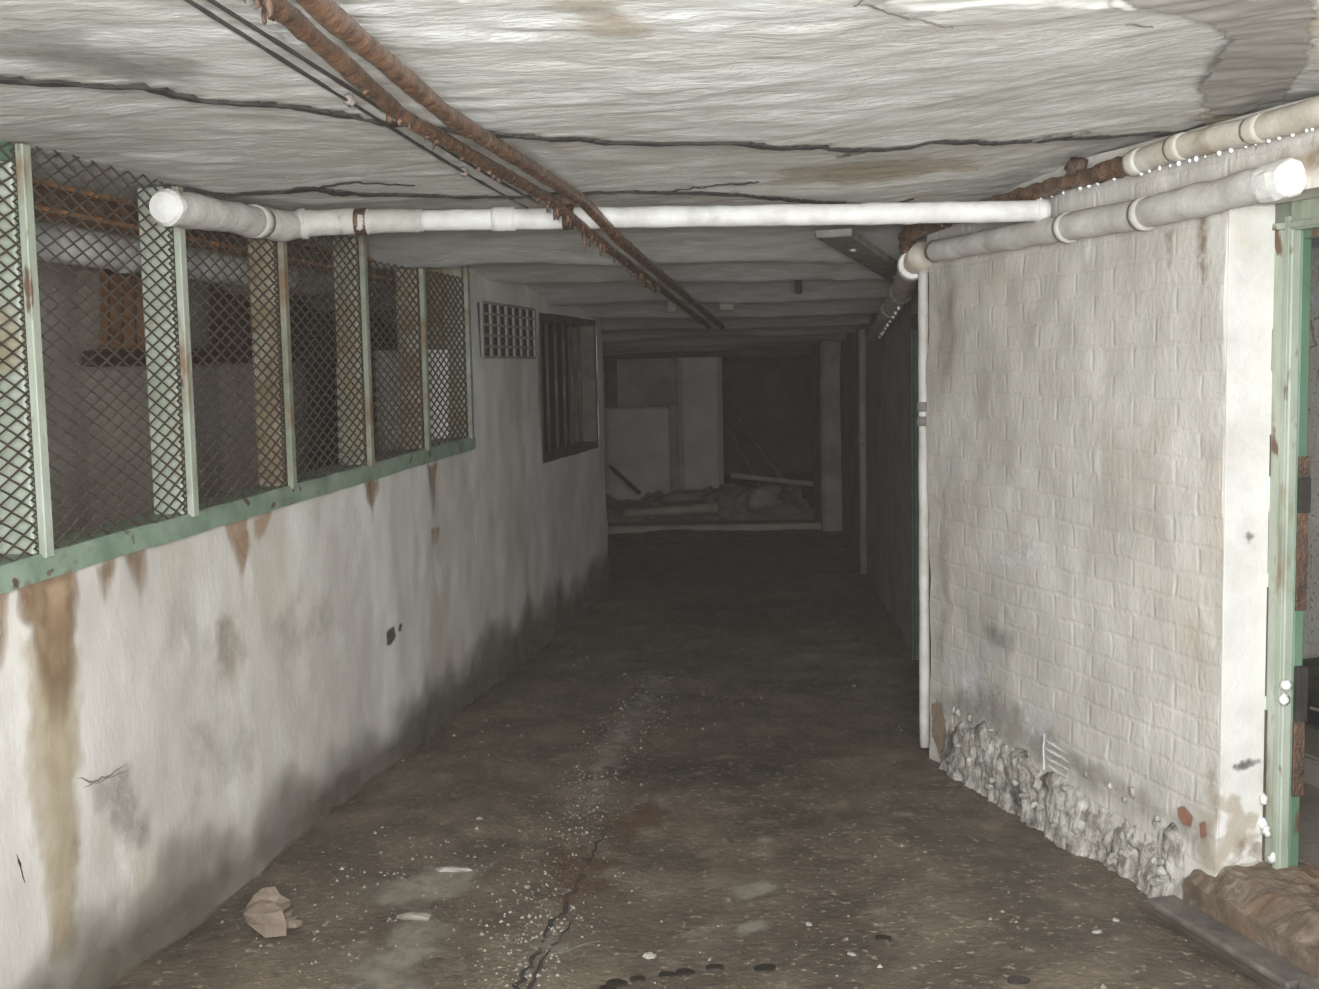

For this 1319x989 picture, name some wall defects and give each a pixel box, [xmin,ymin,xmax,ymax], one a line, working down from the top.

flaking render [854,0,1153,28]
water stain [1124,0,1316,115]
crack [0,75,405,128]
crack [437,124,1206,158]
flaking render [1203,116,1240,124]
crack [185,181,861,204]
corrosion [227,512,271,561]
corrosion [1295,456,1310,611]
corrosion [0,571,77,691]
corrosion [1291,721,1305,797]
flaking render [931,702,1206,900]
crack [512,827,607,989]